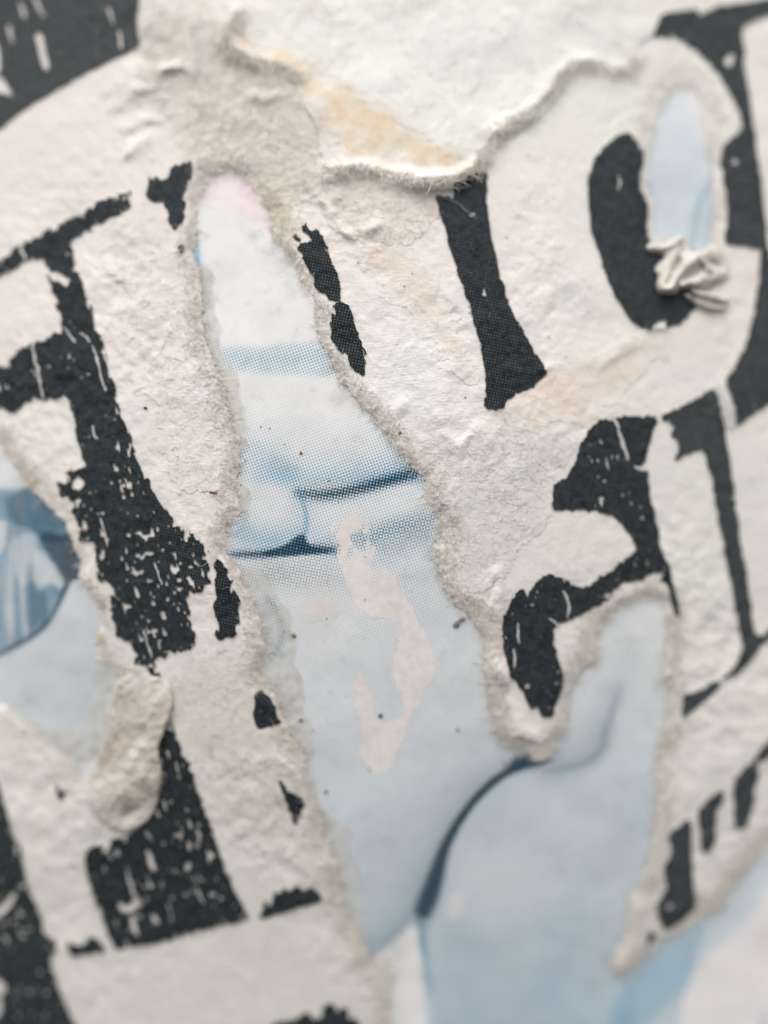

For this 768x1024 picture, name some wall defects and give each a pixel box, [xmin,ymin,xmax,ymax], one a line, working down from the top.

peeling [130,0,658,254]
peeling [330,514,436,775]
peeling [87,646,351,920]